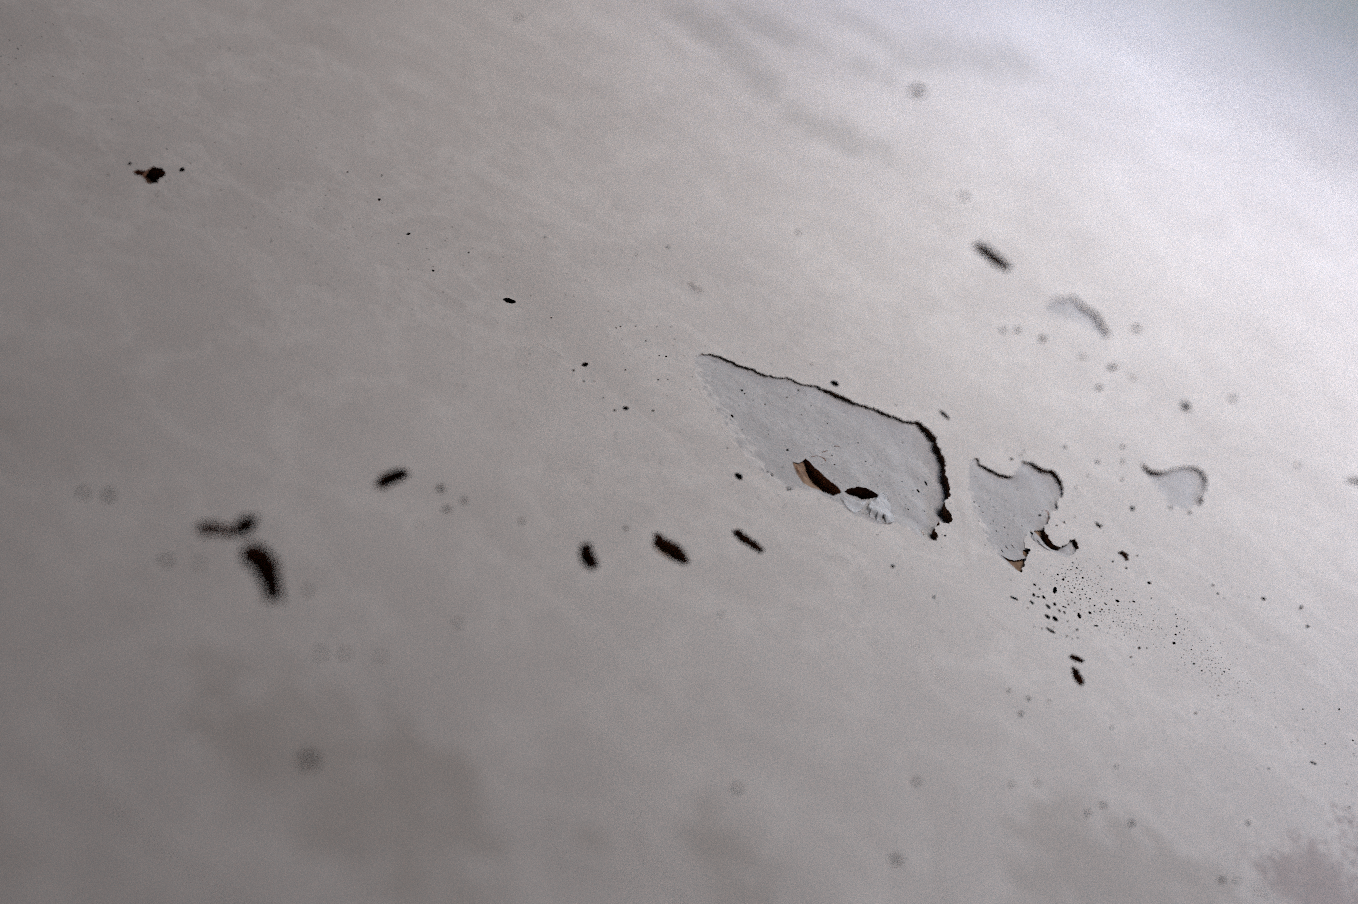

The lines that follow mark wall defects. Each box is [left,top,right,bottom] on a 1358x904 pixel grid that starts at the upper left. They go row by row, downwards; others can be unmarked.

spalling [972,243,1012,271]
spalling [1046,296,1110,337]
spalling [694,353,953,541]
spalling [1141,463,1207,510]
spalling [967,458,1079,572]
spalling [577,542,599,570]
spalling [652,533,690,565]
spalling [732,529,765,554]